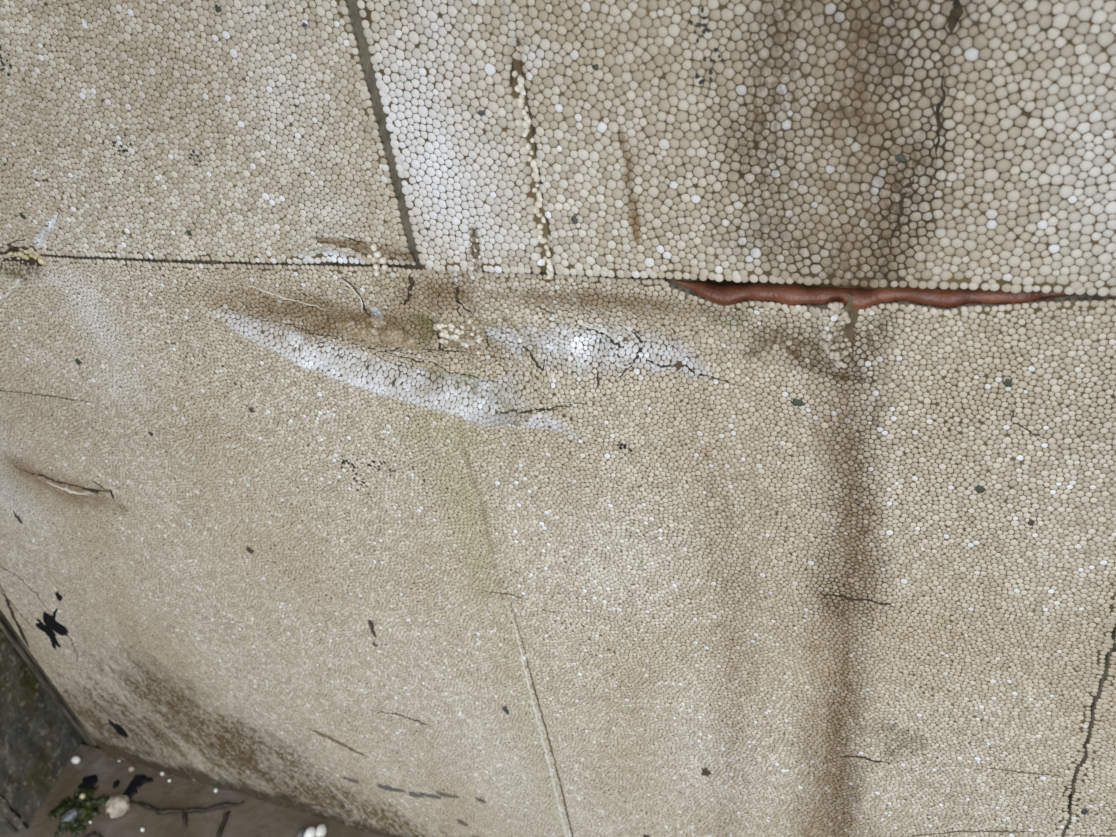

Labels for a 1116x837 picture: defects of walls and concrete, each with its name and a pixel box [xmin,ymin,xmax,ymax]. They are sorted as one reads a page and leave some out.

damp [948,0,963,35]
damp [754,60,780,200]
damp [935,71,946,165]
damp [888,160,917,262]
crack [220,273,744,415]
damp [789,222,874,383]
crack [1011,405,1045,439]
crack [15,466,122,508]